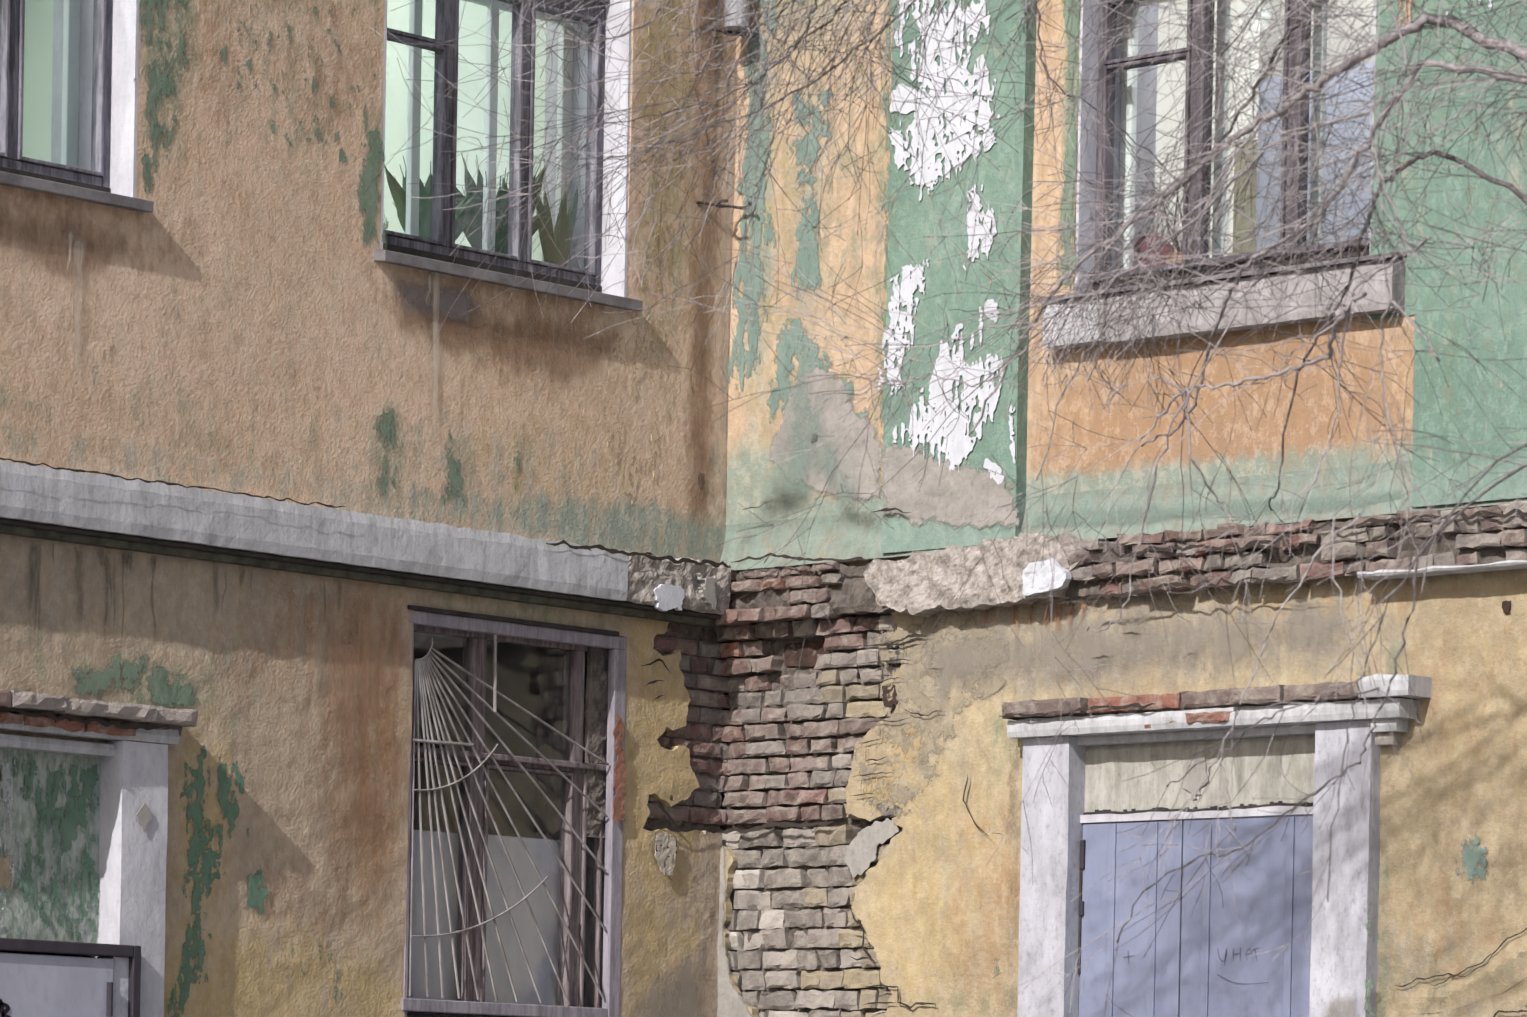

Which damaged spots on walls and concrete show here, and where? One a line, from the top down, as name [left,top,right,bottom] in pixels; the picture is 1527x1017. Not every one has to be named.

peeling [134,0,188,192]
peeling [219,4,388,248]
flaking render [638,0,1527,1017]
peeling [71,653,198,708]
flaking render [583,646,627,838]
peeling [0,754,100,940]
peeling [168,746,249,1017]